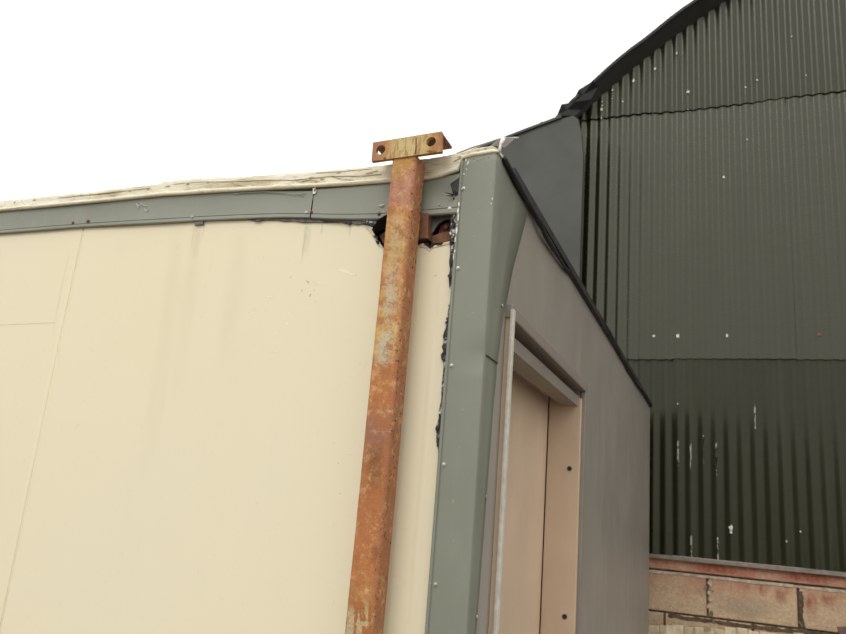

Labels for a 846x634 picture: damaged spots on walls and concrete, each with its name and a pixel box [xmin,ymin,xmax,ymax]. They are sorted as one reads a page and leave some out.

corrosion [353,601,372,634]